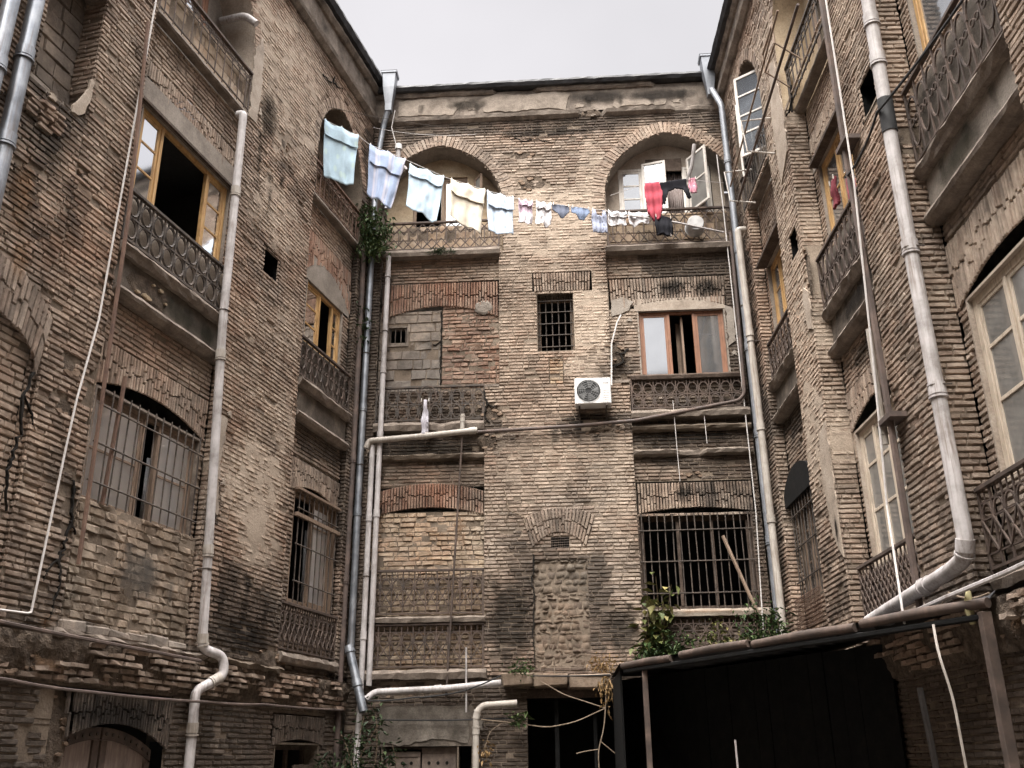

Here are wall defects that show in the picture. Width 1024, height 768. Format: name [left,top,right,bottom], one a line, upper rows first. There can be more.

peeling [398,91,602,118]
peeling [613,97,680,107]
crack [4,372,35,511]
crack [42,480,76,619]